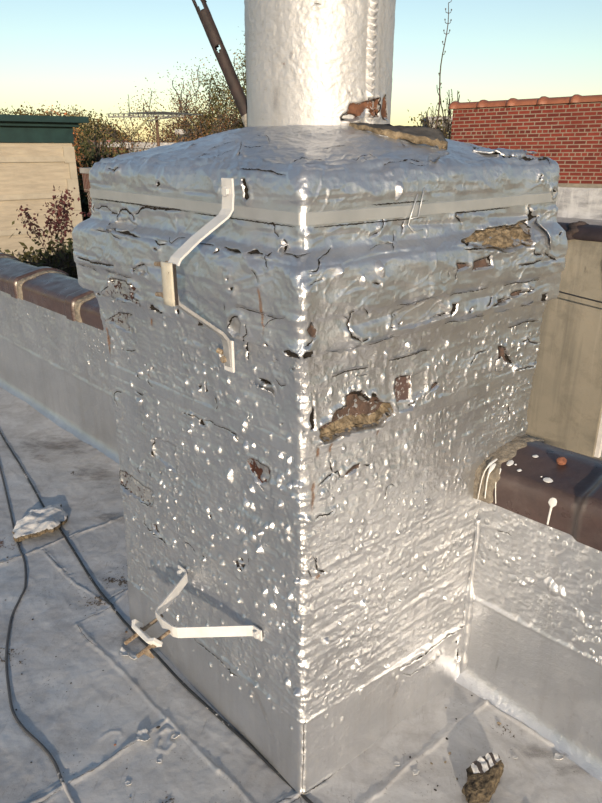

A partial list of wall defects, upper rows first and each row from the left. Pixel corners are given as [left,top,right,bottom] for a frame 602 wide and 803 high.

peeling [344,94,387,121]
crack [92,205,180,239]
crack [253,222,331,285]
spalling [457,216,553,272]
crack [521,250,557,266]
spalling [319,370,439,445]
peeling [119,471,154,505]
peeling [246,458,271,491]
crack [277,721,329,803]